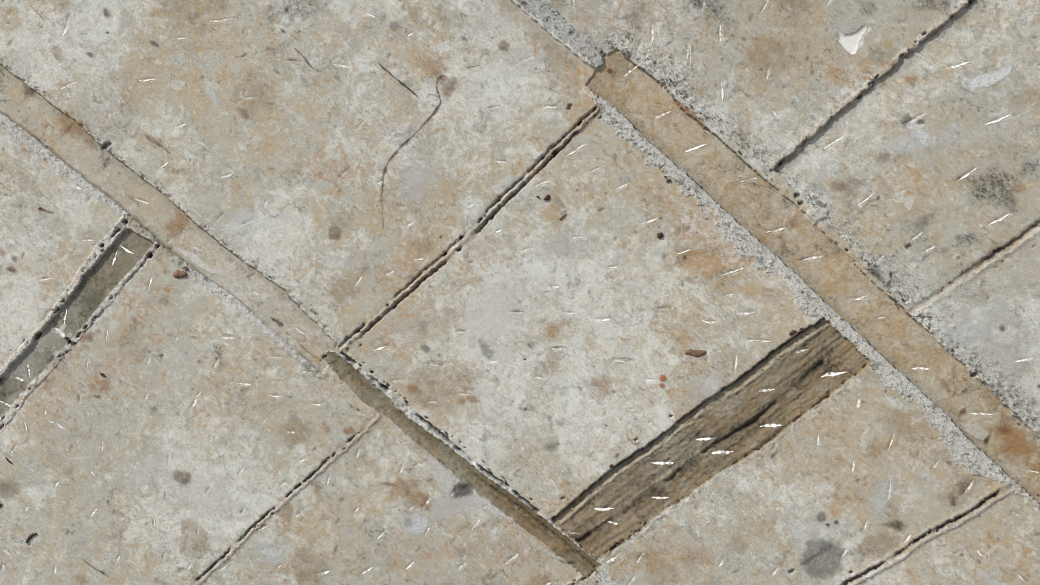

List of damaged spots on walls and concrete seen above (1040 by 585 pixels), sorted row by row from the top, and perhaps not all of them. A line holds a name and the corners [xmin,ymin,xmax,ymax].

spalling [838,24,876,55]
crack [379,64,445,191]
leakage [972,163,1038,204]
leakage [802,540,840,576]